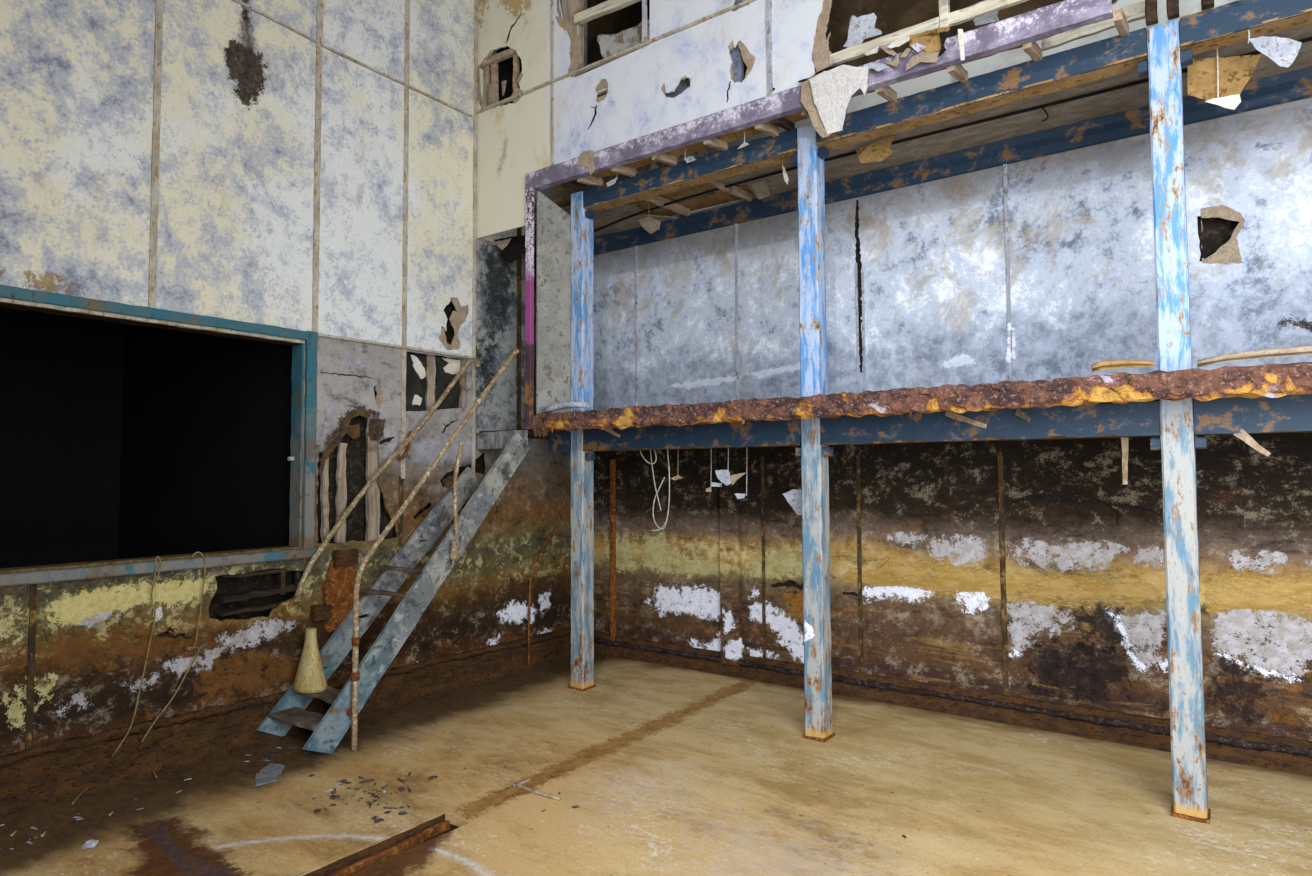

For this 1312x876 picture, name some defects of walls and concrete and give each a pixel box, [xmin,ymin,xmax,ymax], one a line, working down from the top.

water stain [223,0,271,110]
peeling [801,65,869,138]
spalling [1197,217,1239,261]
spalling [442,297,469,345]
corrosion [944,393,1042,412]
corrosion [1059,396,1086,407]
spalling [316,415,396,543]
water stain [123,618,296,692]
spalling [209,568,295,621]
water stain [616,531,804,663]
water stain [841,531,1168,702]
water stain [1205,549,1312,723]